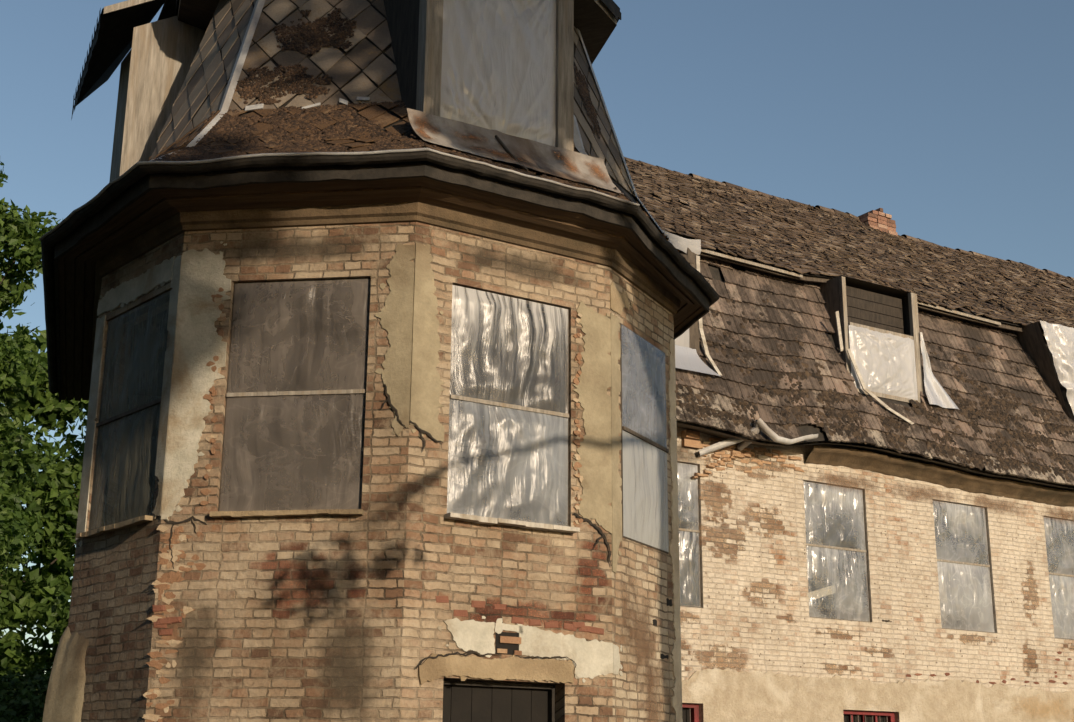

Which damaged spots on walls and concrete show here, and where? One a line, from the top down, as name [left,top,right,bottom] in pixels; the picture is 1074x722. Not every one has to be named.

peeling [375,235,445,441]
peeling [75,241,231,722]
spalling [692,438,804,559]
peeling [418,596,623,684]
peeling [1022,561,1038,621]